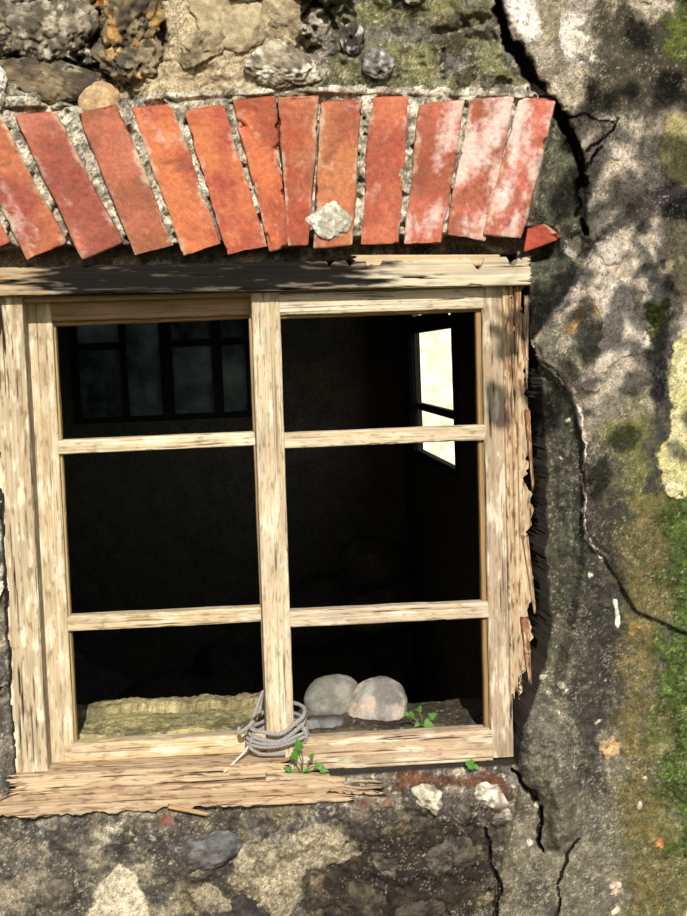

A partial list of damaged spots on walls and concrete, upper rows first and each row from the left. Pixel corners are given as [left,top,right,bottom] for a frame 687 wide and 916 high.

crack [492,0,619,236]
spalling [531,117,654,625]
crack [484,827,503,916]
crack [510,768,580,916]